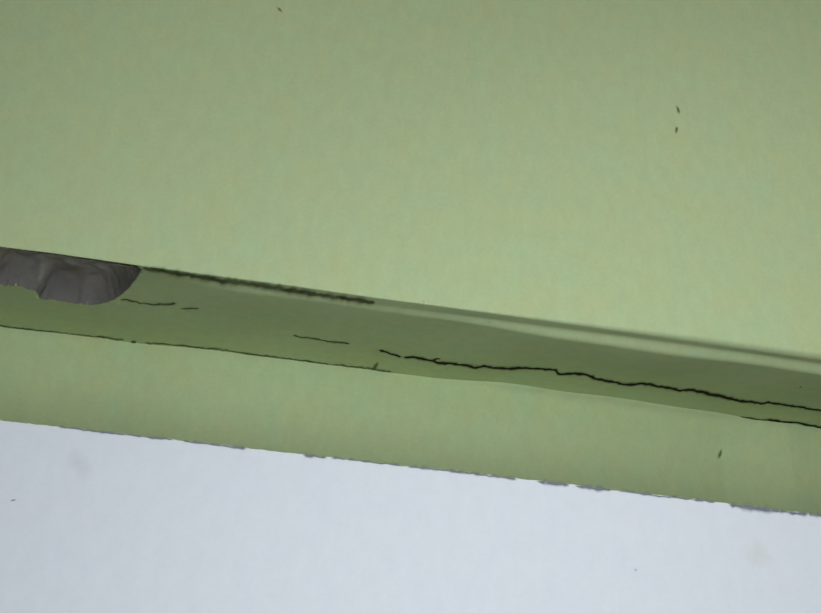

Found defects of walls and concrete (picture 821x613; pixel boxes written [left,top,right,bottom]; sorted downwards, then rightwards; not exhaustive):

spalling [0,247,141,305]
crack [0,325,122,340]
crack [294,335,349,344]
crack [146,342,821,428]